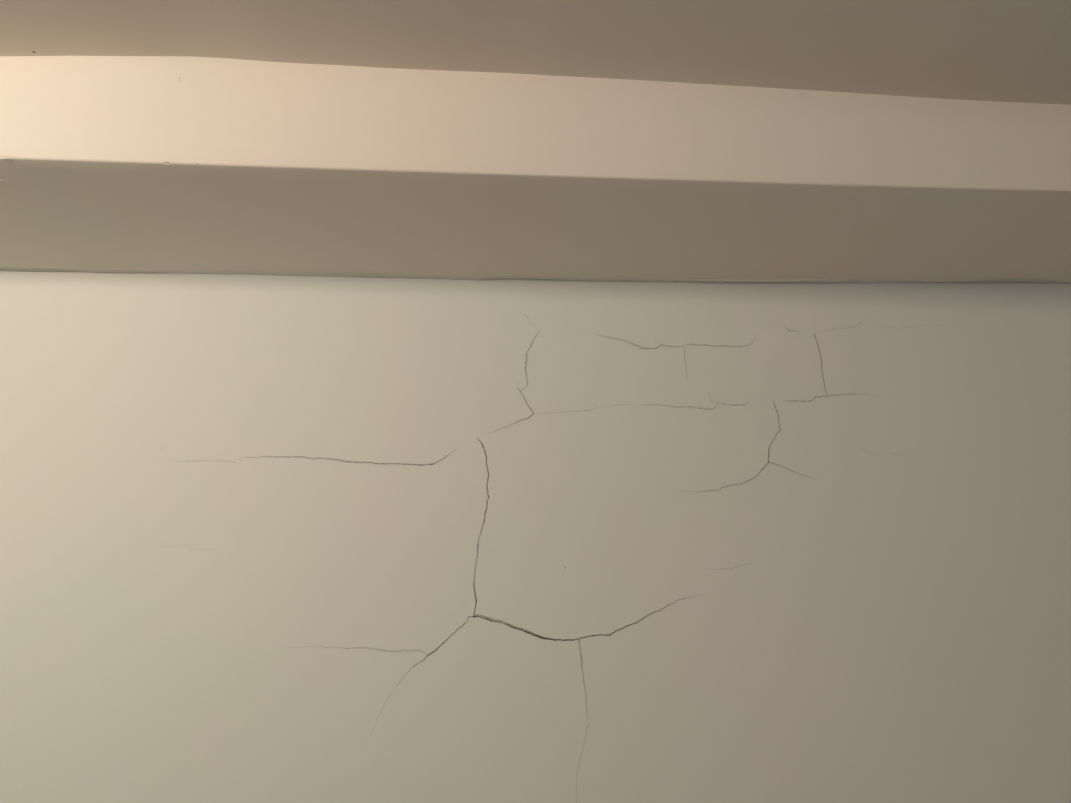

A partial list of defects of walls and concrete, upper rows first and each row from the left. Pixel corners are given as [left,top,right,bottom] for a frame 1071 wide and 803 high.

crack [427,584,652,657]